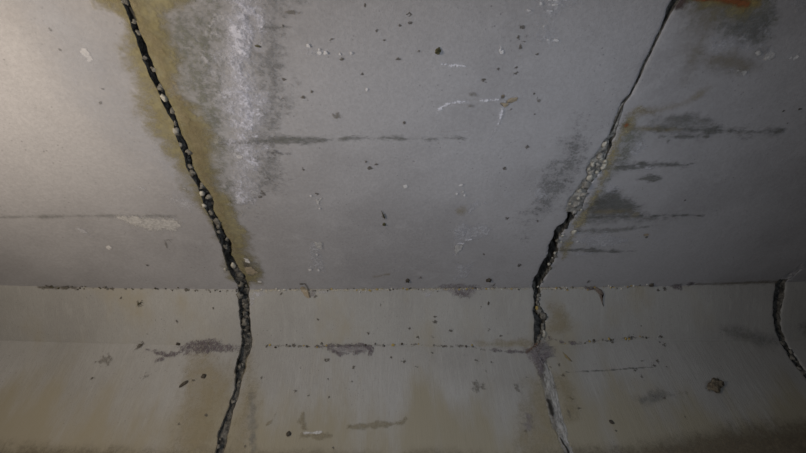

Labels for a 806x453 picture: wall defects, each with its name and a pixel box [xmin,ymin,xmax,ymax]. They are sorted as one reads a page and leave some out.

crack [121,0,252,453]
damp [162,0,283,204]
crack [532,2,671,453]
damp [588,118,661,218]